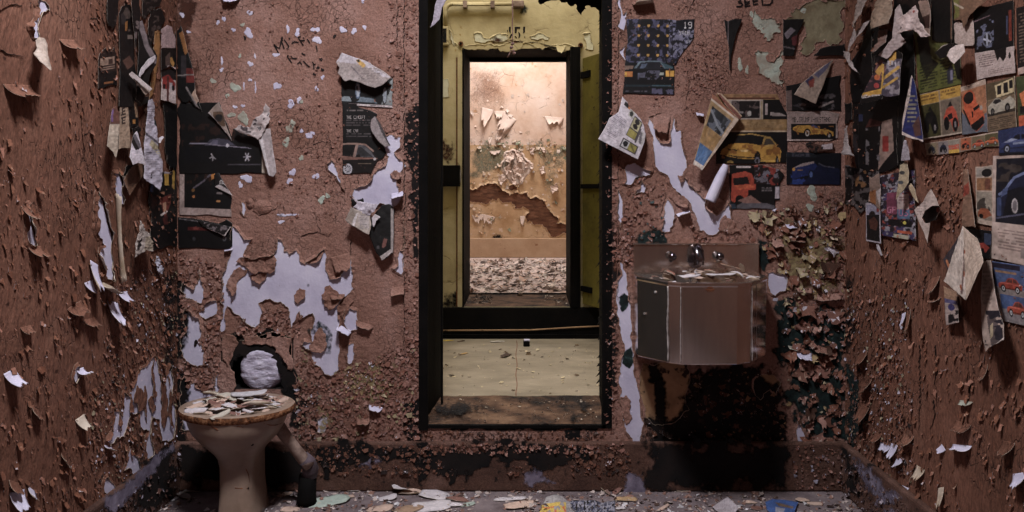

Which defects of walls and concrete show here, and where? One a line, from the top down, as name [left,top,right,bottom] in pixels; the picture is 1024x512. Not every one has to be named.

flaking render [449,0,707,134]
peeling [650,42,726,117]
flaking render [470,84,566,238]
peeling [677,263,740,278]
peeling [0,343,50,387]
peeling [15,321,46,335]
peeling [231,389,274,406]
peeling [918,333,999,468]
peeling [977,349,1024,432]
peeling [117,447,182,512]
leakage [315,400,598,487]
peeling [988,440,1024,508]